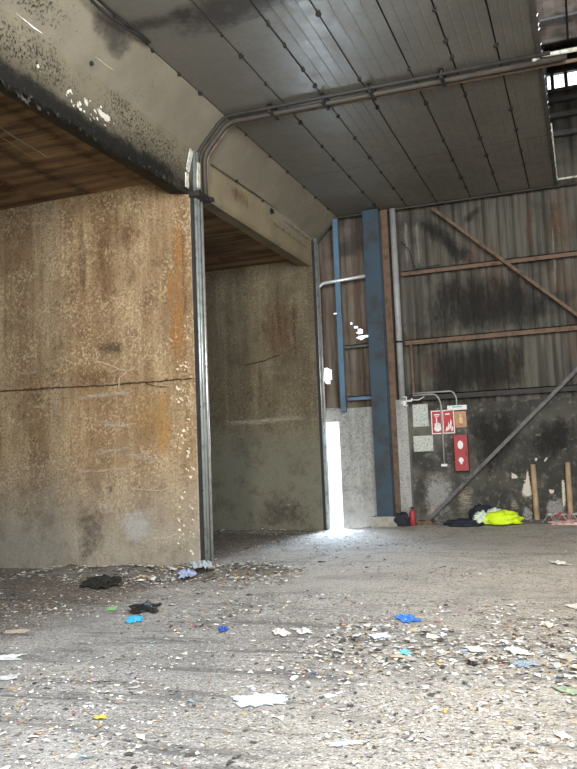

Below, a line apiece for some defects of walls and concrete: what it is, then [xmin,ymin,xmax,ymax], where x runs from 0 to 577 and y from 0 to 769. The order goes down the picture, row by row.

leakage [97,0,274,52]
leakage [0,20,75,89]
spalling [0,77,59,117]
spalling [66,89,110,126]
crack [0,358,192,392]